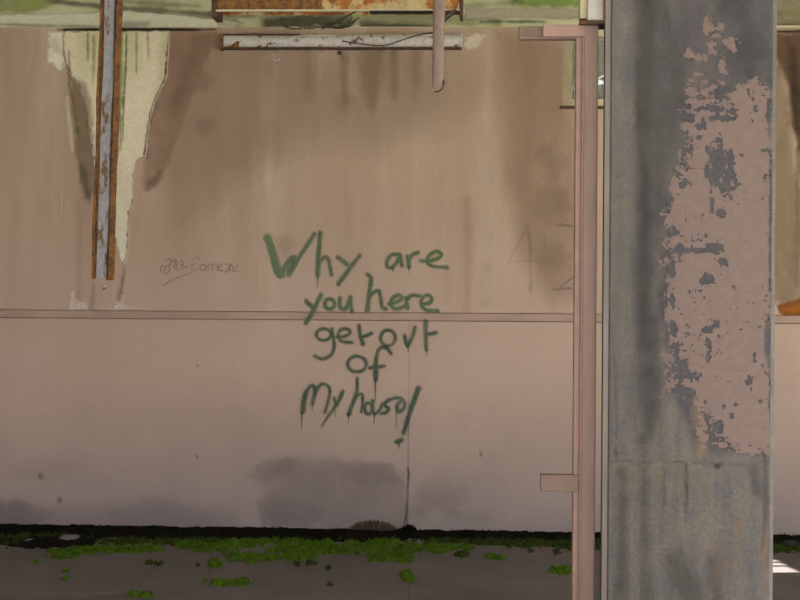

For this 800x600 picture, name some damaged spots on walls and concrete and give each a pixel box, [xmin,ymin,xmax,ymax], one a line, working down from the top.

water stain [662,218,729,309]
peeling [658,16,772,468]
water stain [666,310,739,450]